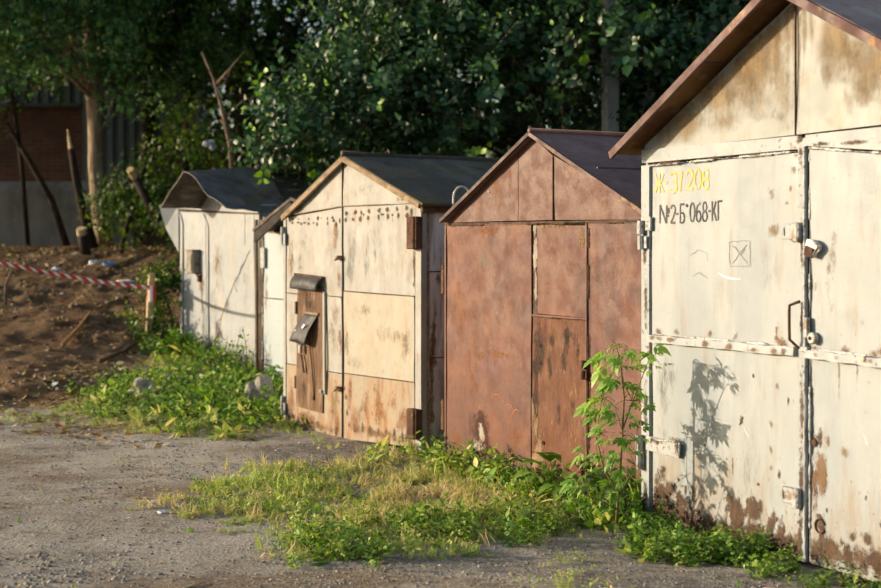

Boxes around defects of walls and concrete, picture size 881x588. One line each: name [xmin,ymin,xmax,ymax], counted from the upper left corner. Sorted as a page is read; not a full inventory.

corrosion [291,198,413,251]
corrosion [287,381,410,442]
peeling [473,423,485,453]
corrosion [799,374,822,447]
corrosion [643,454,881,577]